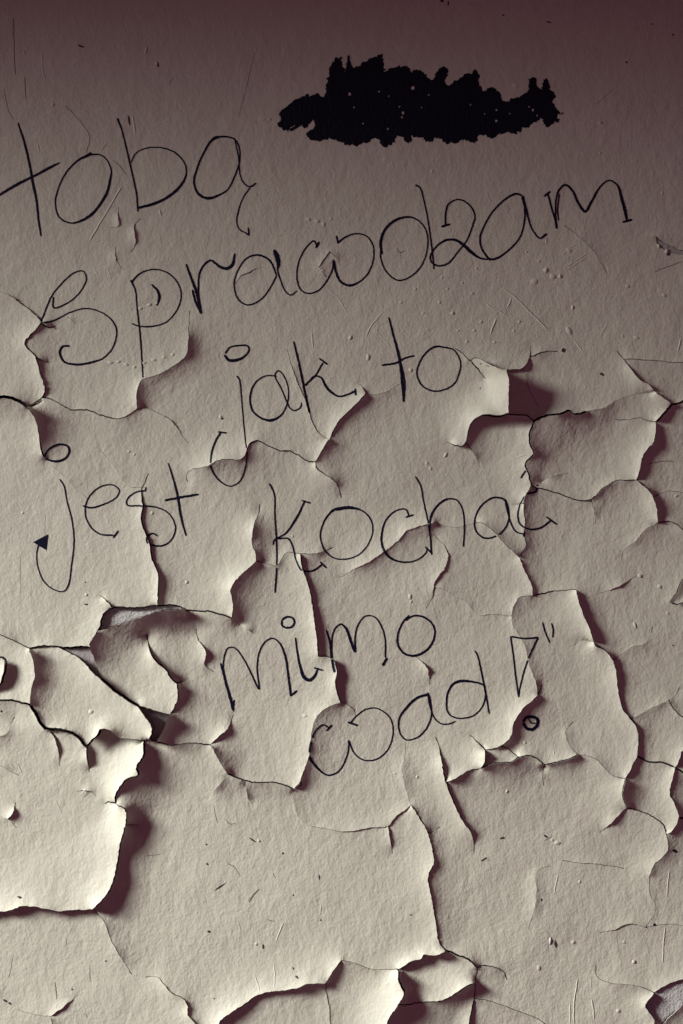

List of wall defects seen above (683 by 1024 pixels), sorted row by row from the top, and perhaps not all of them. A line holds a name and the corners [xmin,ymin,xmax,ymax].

crack [0,292,190,498]
peeling [0,292,683,1024]
crack [0,345,683,1024]